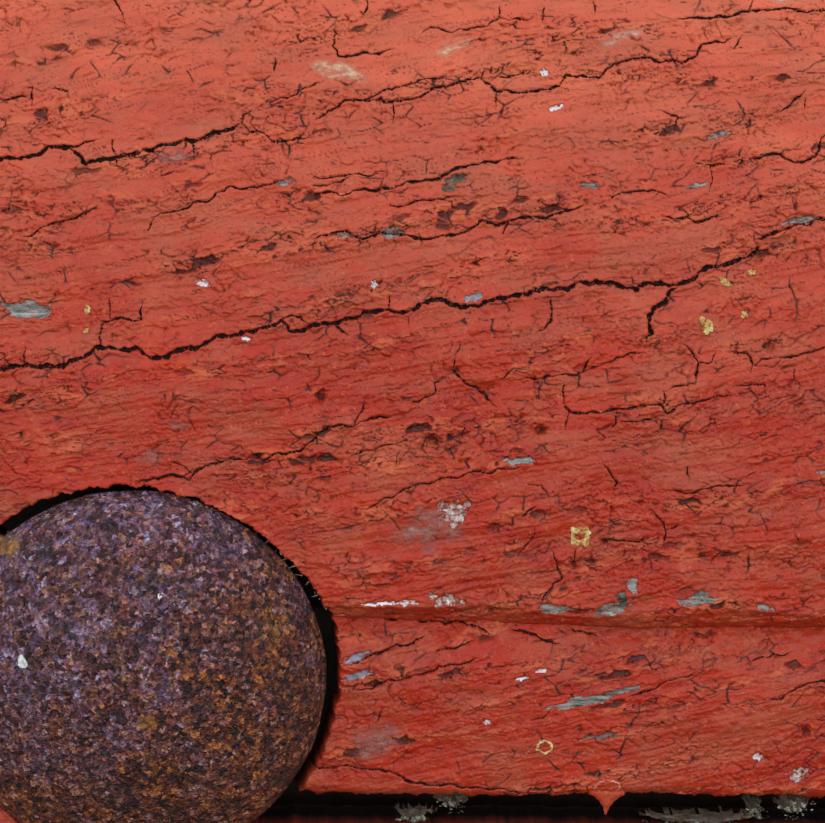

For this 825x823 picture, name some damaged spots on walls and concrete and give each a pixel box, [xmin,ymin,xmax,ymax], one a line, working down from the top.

crack [679,1,825,20]
crack [0,38,740,167]
crack [313,157,523,208]
crack [314,205,584,240]
peeling [0,299,52,320]
crack [0,217,825,428]
crack [136,398,425,484]
peeling [436,499,471,529]
rust [0,537,19,554]
peeling [538,578,638,616]
peeling [677,590,721,607]
peeling [544,686,639,711]